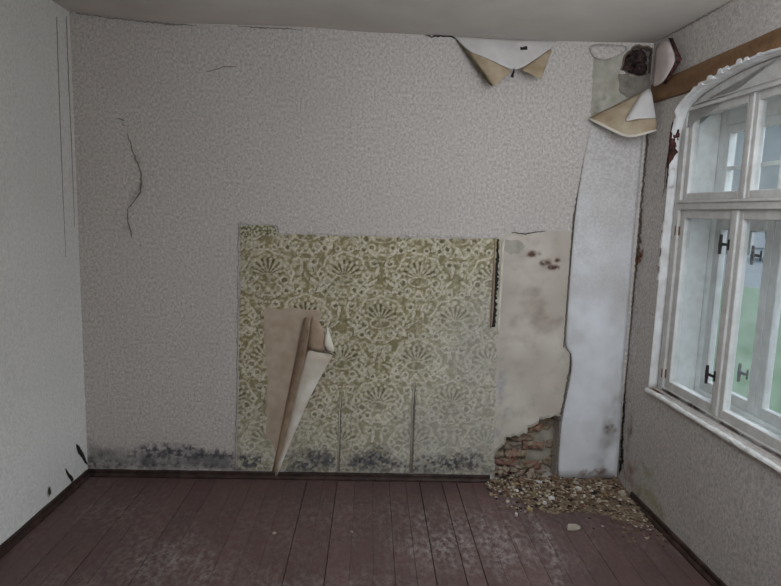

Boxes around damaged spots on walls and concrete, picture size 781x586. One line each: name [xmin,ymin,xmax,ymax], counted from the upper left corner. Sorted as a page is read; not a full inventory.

peeling [456,37,556,86]
peeling [589,44,657,138]
crack [66,444,88,482]
leakage [134,445,262,468]
leakage [352,448,478,470]
flaking render [492,412,561,479]